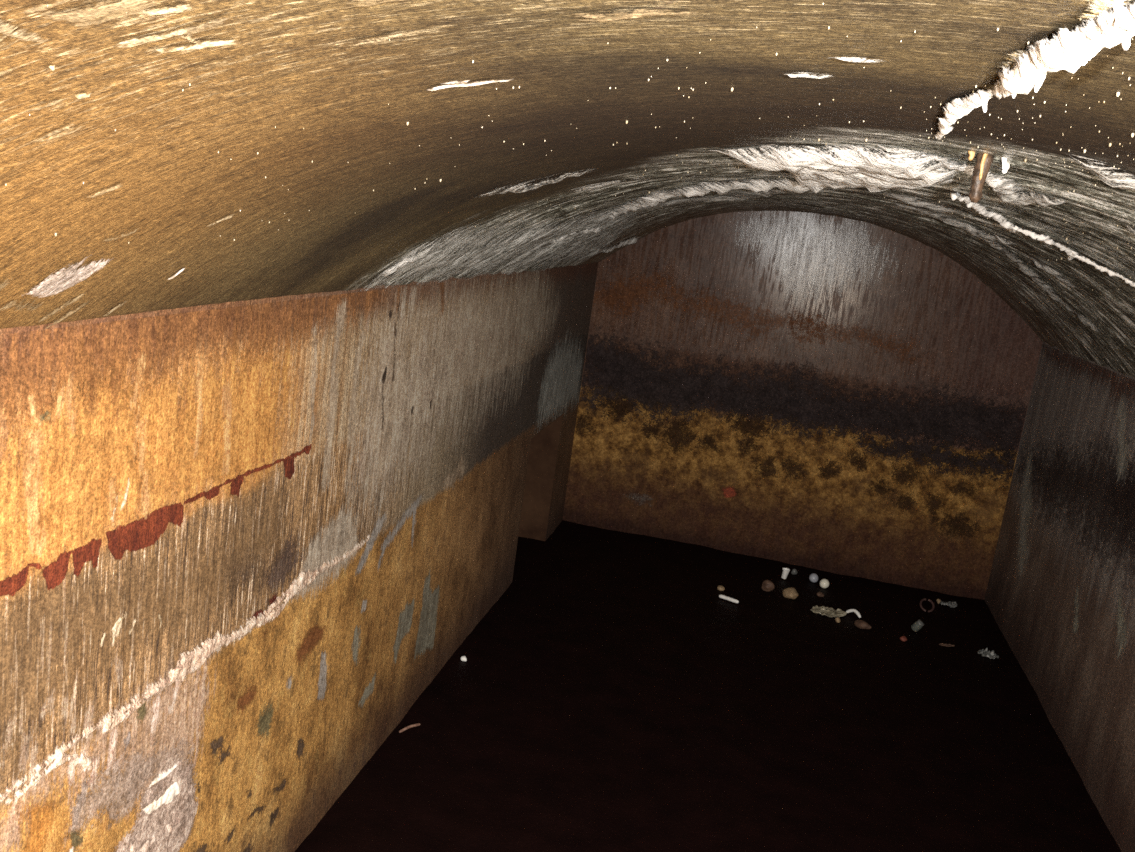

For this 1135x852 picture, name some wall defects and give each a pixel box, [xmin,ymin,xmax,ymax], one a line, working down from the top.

damp [934,0,1135,140]
rust [0,347,312,608]
damp [0,144,1135,663]
damp [0,658,230,852]
damp [247,790,279,826]
damp [257,704,274,738]